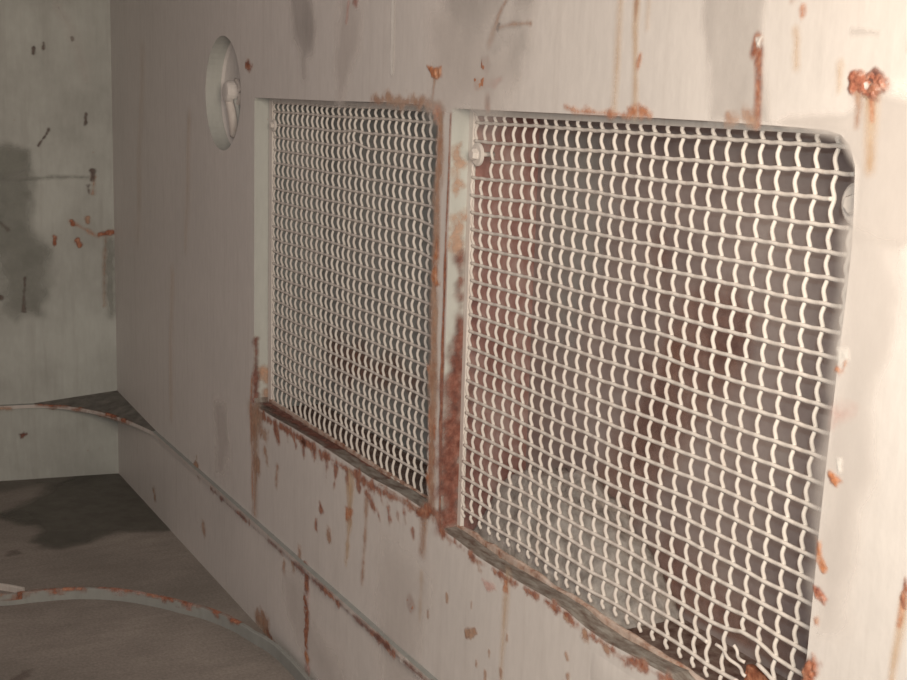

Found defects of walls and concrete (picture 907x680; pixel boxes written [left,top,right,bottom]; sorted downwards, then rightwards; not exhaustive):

rust [607,0,651,117]
rust [726,34,762,128]
rust [848,68,888,170]
damp [0,146,50,314]
rust [250,92,467,557]
damp [1,473,170,547]
rust [493,569,615,654]
rust [623,657,672,680]
rust [801,657,817,680]